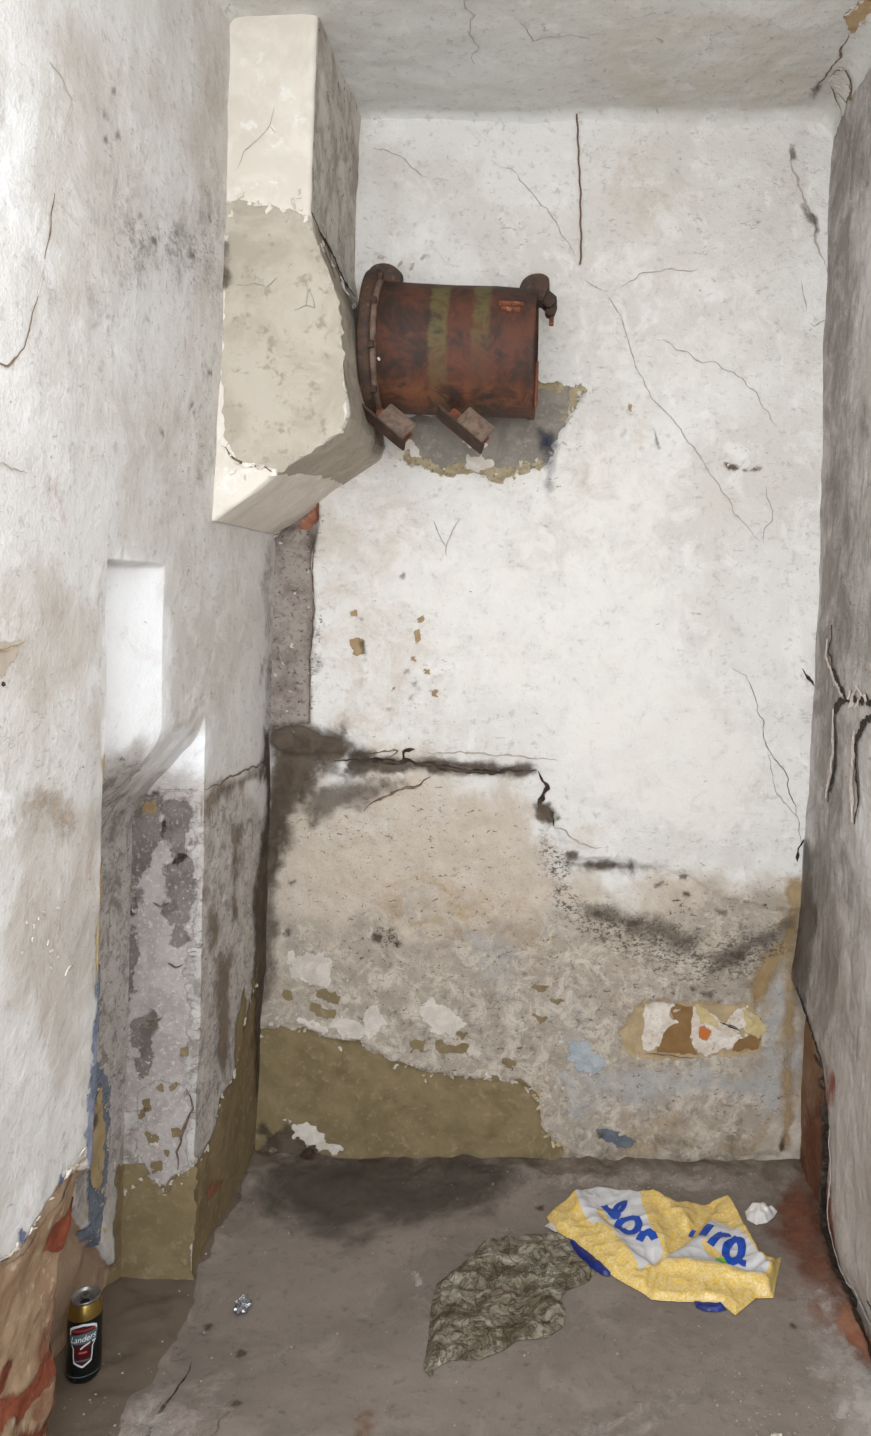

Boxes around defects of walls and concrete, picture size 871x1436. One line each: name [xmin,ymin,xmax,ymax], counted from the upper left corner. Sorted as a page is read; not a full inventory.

crack [0,193,55,368]
flaking render [220,189,599,485]
crack [491,160,777,543]
peeling [0,640,26,678]
leakage [307,757,535,826]
crack [335,748,602,849]
crack [735,625,871,862]
leakage [373,927,399,947]
peeling [619,998,767,1063]
peeling [0,788,606,1436]
leakage [258,1119,507,1231]
peeling [596,1129,635,1148]